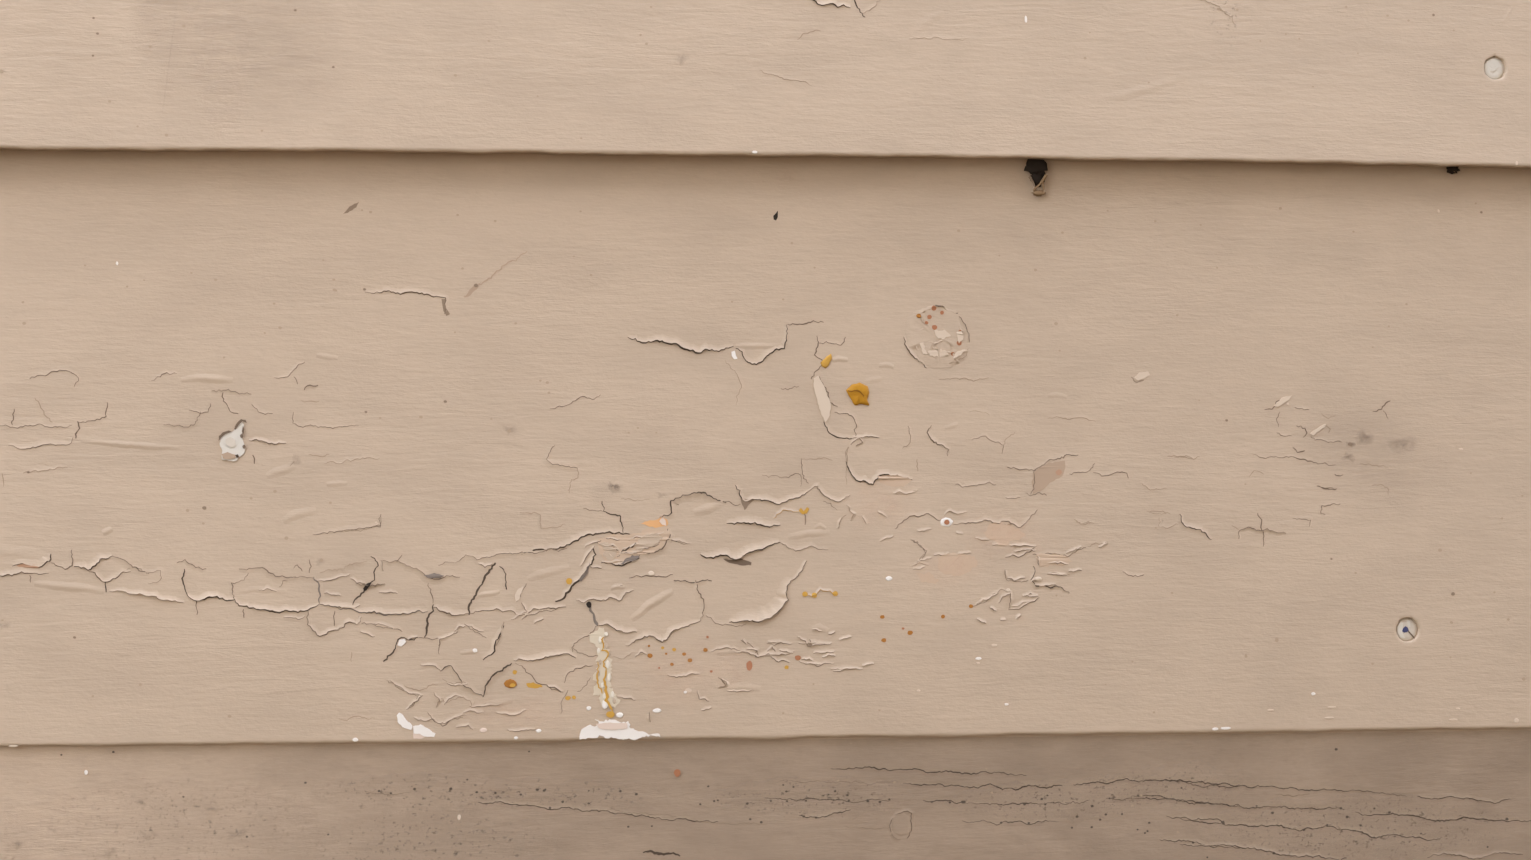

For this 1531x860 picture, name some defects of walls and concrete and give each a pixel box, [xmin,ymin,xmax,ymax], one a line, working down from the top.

crack [365,286,450,316]
peeling [920,330,968,359]
peeling [813,376,831,422]
peeling [878,475,911,487]
crack [1147,400,1389,546]
crack [0,320,1144,732]
peeling [598,517,670,576]
peeling [579,632,660,740]
peeling [397,713,435,739]